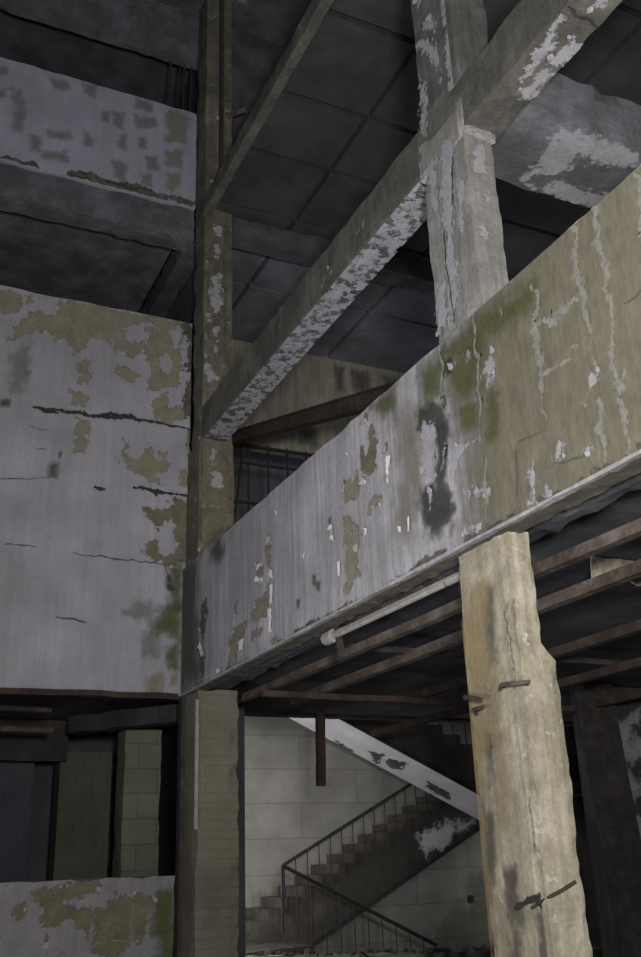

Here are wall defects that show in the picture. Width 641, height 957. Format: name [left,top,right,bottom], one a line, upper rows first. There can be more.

peeling [518,12,583,100]
peeling [0,290,192,454]
crack [31,406,190,450]
crack [73,552,178,566]
peeling [118,437,188,569]
crack [133,485,187,497]
peeling [202,181,427,552]
spalling [185,413,641,697]
damp [393,348,456,535]
damp [472,314,482,420]
damp [529,206,631,455]
damp [594,397,608,467]